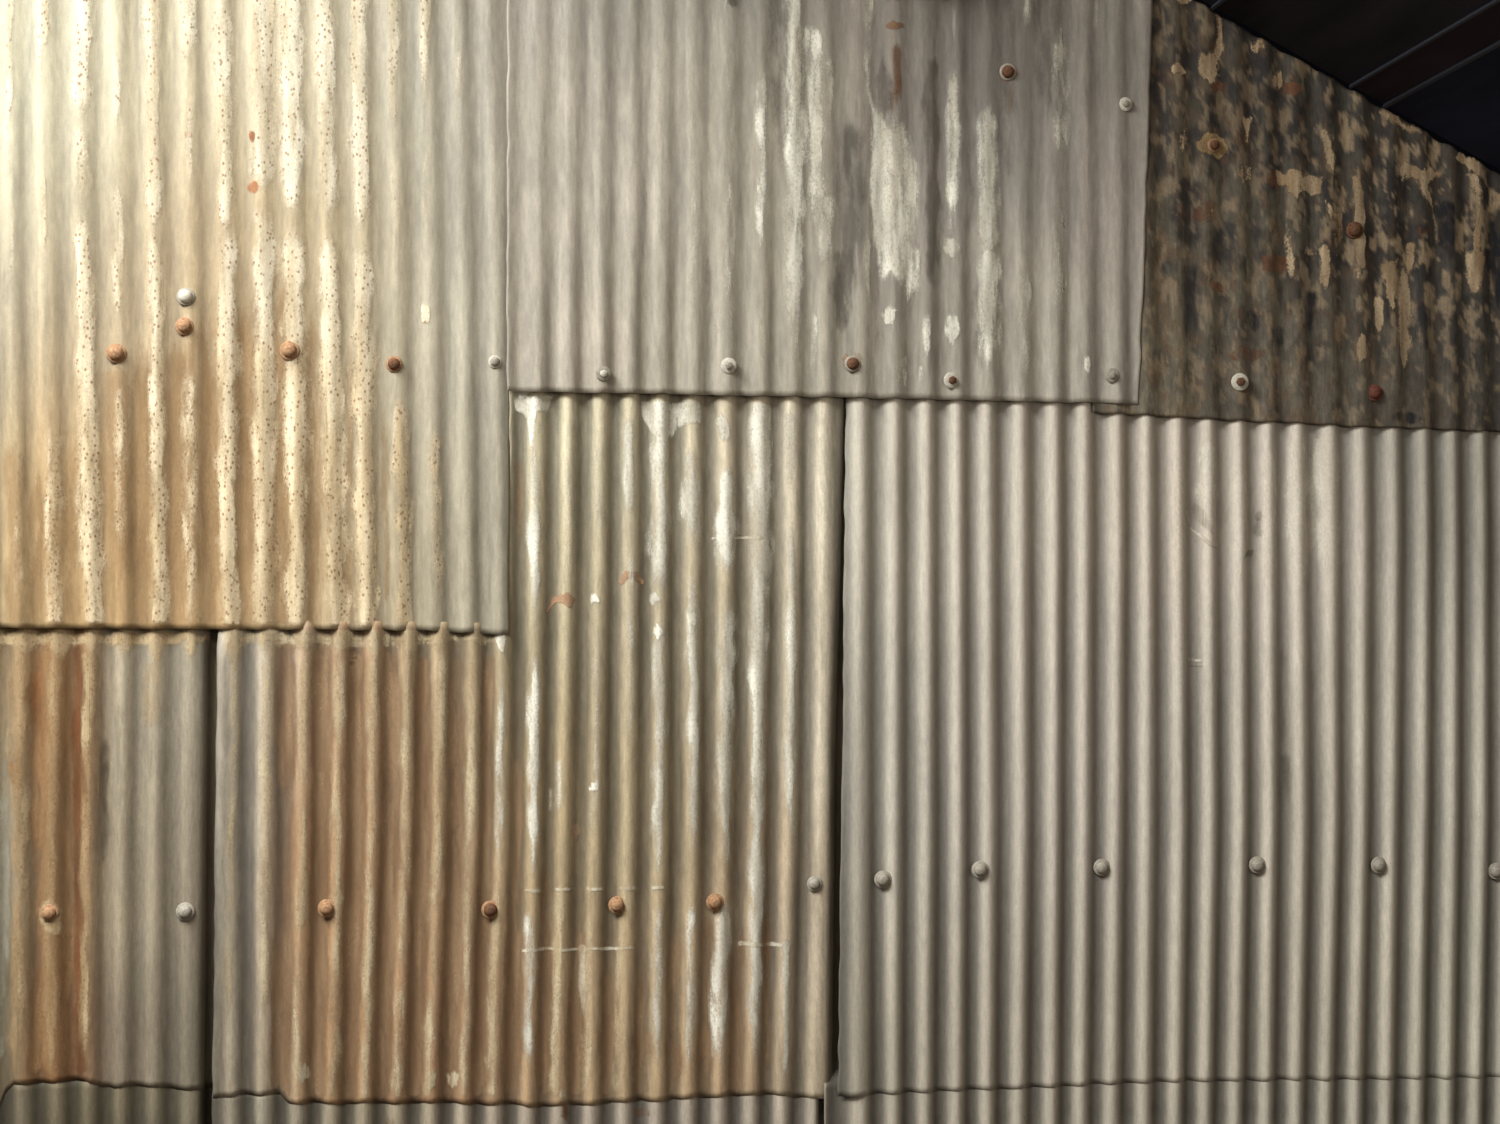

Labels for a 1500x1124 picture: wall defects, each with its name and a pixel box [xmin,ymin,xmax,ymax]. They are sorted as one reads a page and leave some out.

damp [923,62,939,154]
peeling [1171,15,1224,83]
peeling [1242,116,1252,142]
peeling [1379,111,1420,133]
damp [835,131,860,321]
peeling [1276,130,1415,367]
peeling [1399,161,1441,242]
peeling [1456,152,1485,293]
corrosion [9,649,87,1077]
corrosion [308,654,461,1095]
corrosion [271,956,290,1055]
corrosion [411,901,520,1095]